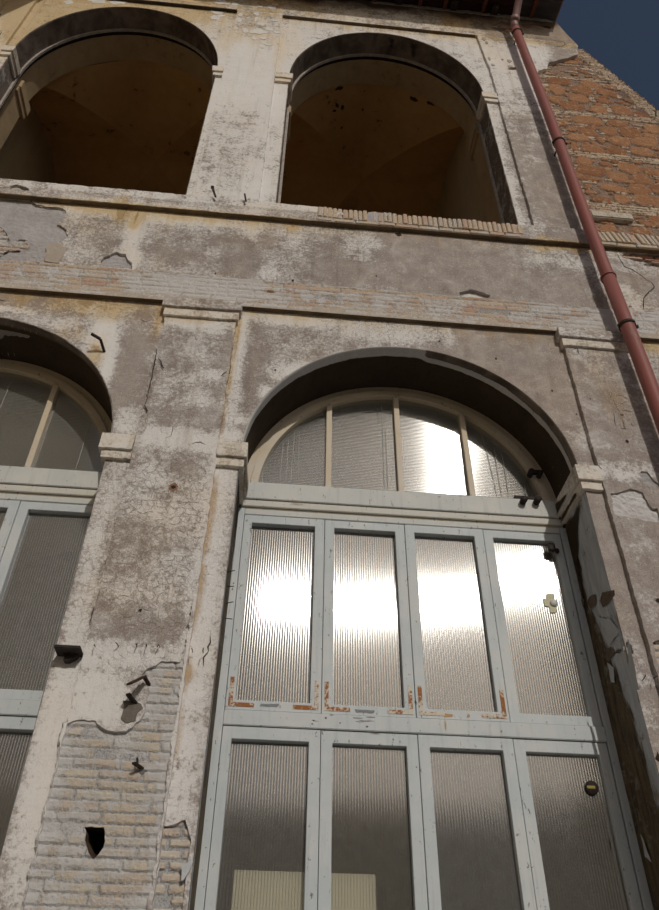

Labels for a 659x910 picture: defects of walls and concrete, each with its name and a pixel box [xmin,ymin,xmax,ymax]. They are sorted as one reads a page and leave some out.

spalling [0,187,68,263]
crack [618,255,655,310]
spalling [611,472,659,522]
spalling [21,607,193,910]